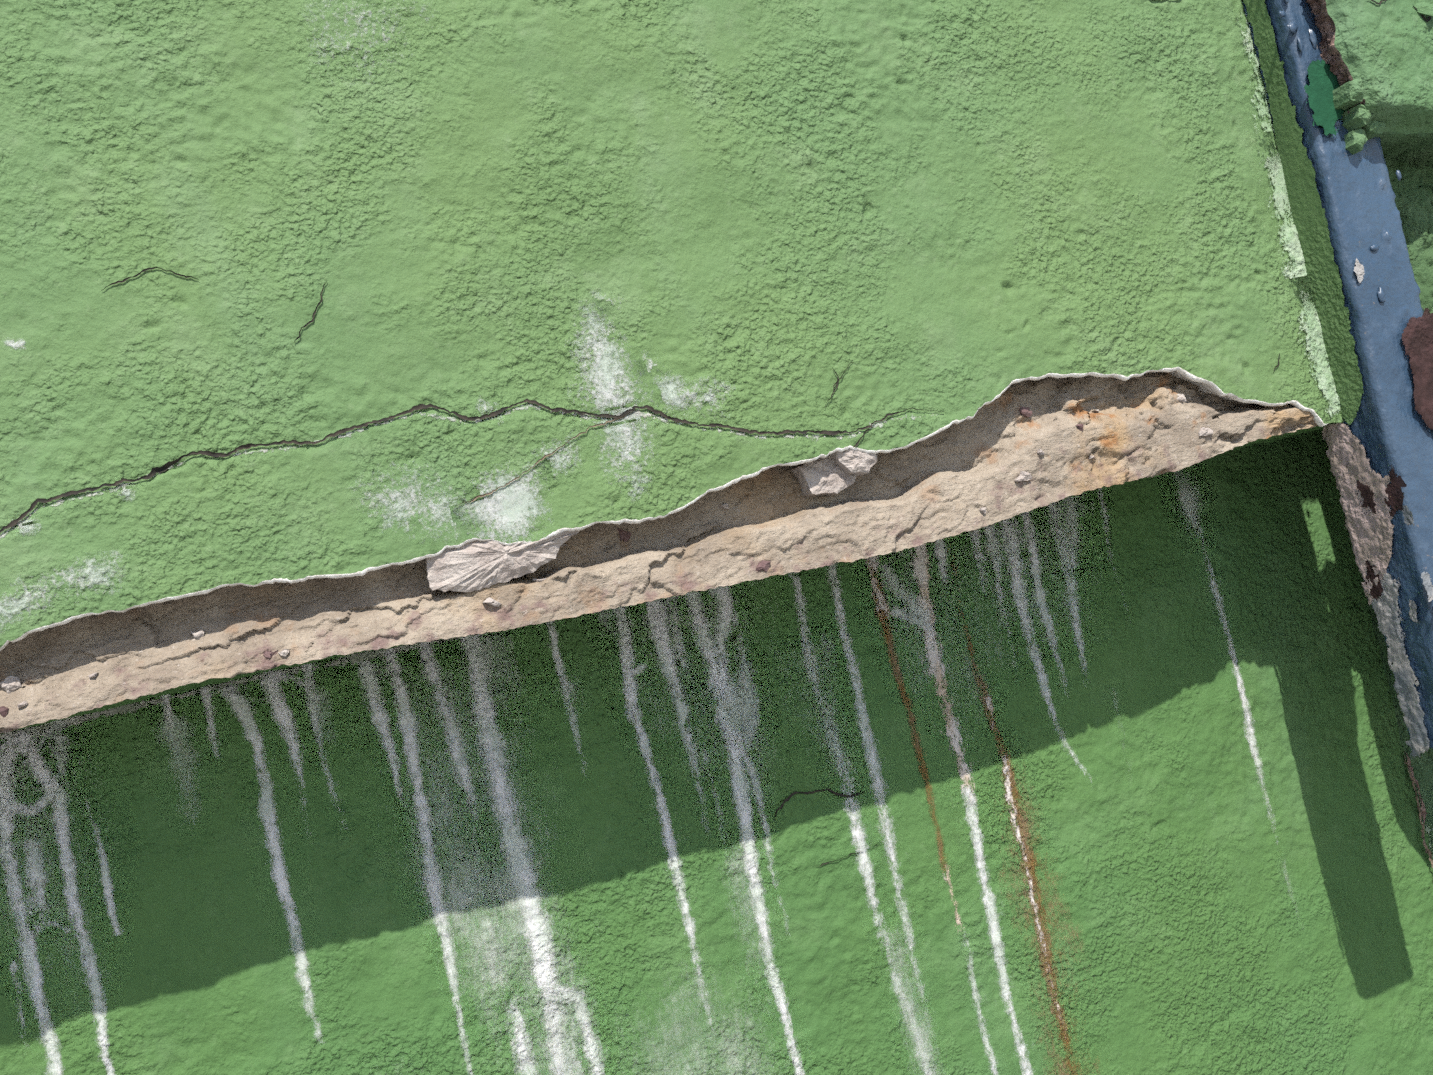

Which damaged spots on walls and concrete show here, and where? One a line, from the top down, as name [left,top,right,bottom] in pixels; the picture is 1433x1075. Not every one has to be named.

water stain [0,621,603,1075]
efflorescence [365,470,546,542]
crack [0,360,944,538]
efflorescence [575,309,648,496]
water stain [615,586,804,1075]
spalling [0,10,1433,759]
water stain [847,799,877,922]
rust [866,555,961,924]
water stain [883,539,1031,1075]
water stain [973,512,1058,717]
rust [969,643,1071,1075]
rust [1402,308,1433,429]